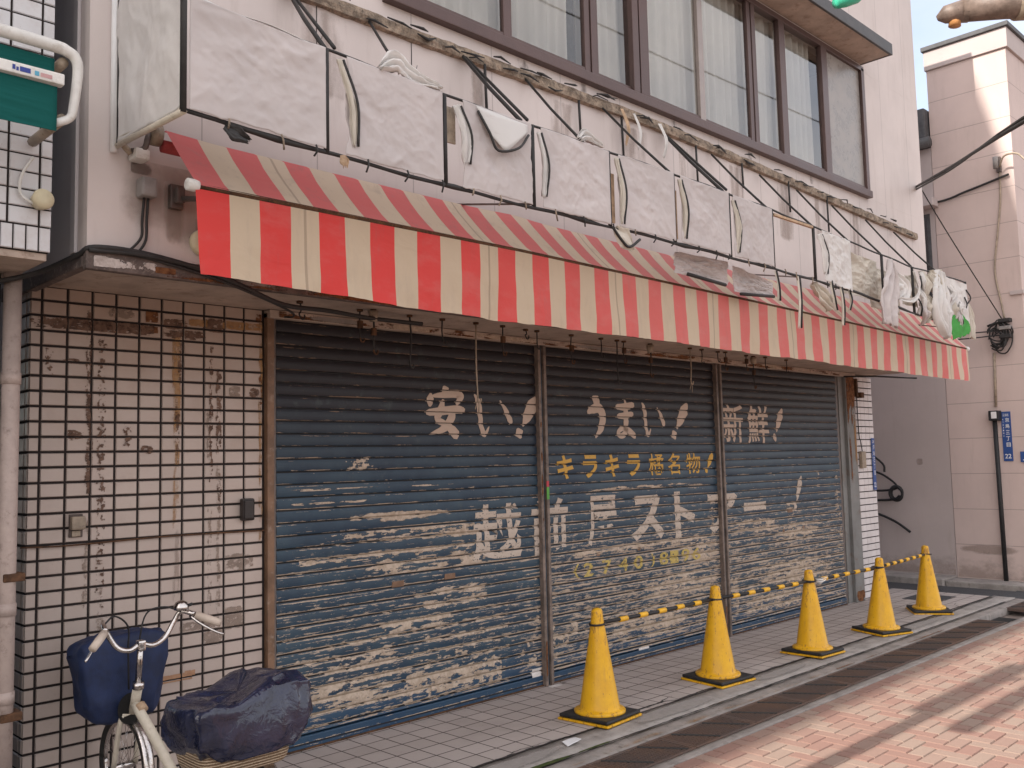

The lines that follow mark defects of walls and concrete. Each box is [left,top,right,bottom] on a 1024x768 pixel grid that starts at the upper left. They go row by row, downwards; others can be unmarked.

peeling [94,255,176,275]
peeling [231,278,272,287]
rust [30,311,262,520]
peeling [345,457,373,471]
rust [845,377,857,480]
peeling [291,487,486,577]
peeling [551,464,843,658]
peeling [285,583,541,730]